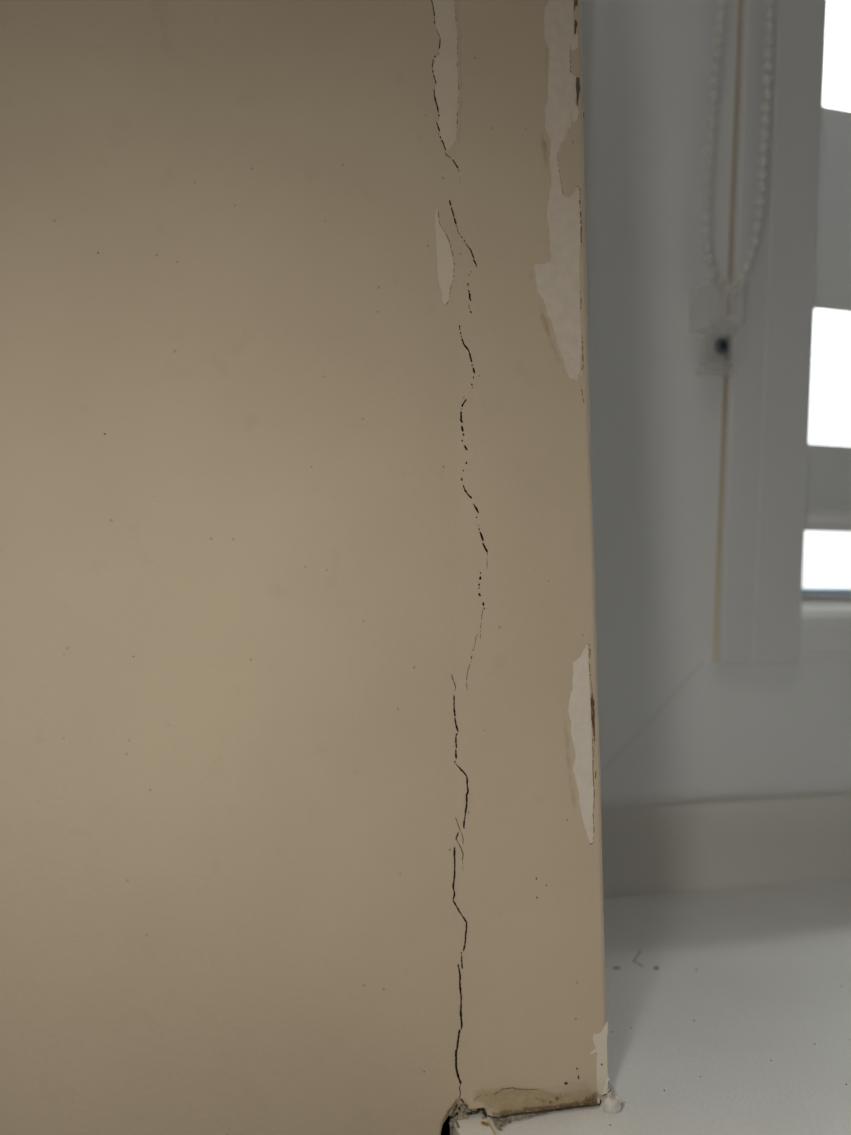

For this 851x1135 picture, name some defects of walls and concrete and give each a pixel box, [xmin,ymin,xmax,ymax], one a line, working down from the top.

peeling [432,0,462,151]
peeling [435,207,455,305]
peeling [534,0,584,402]
crack [431,0,538,1101]
peeling [568,644,595,845]